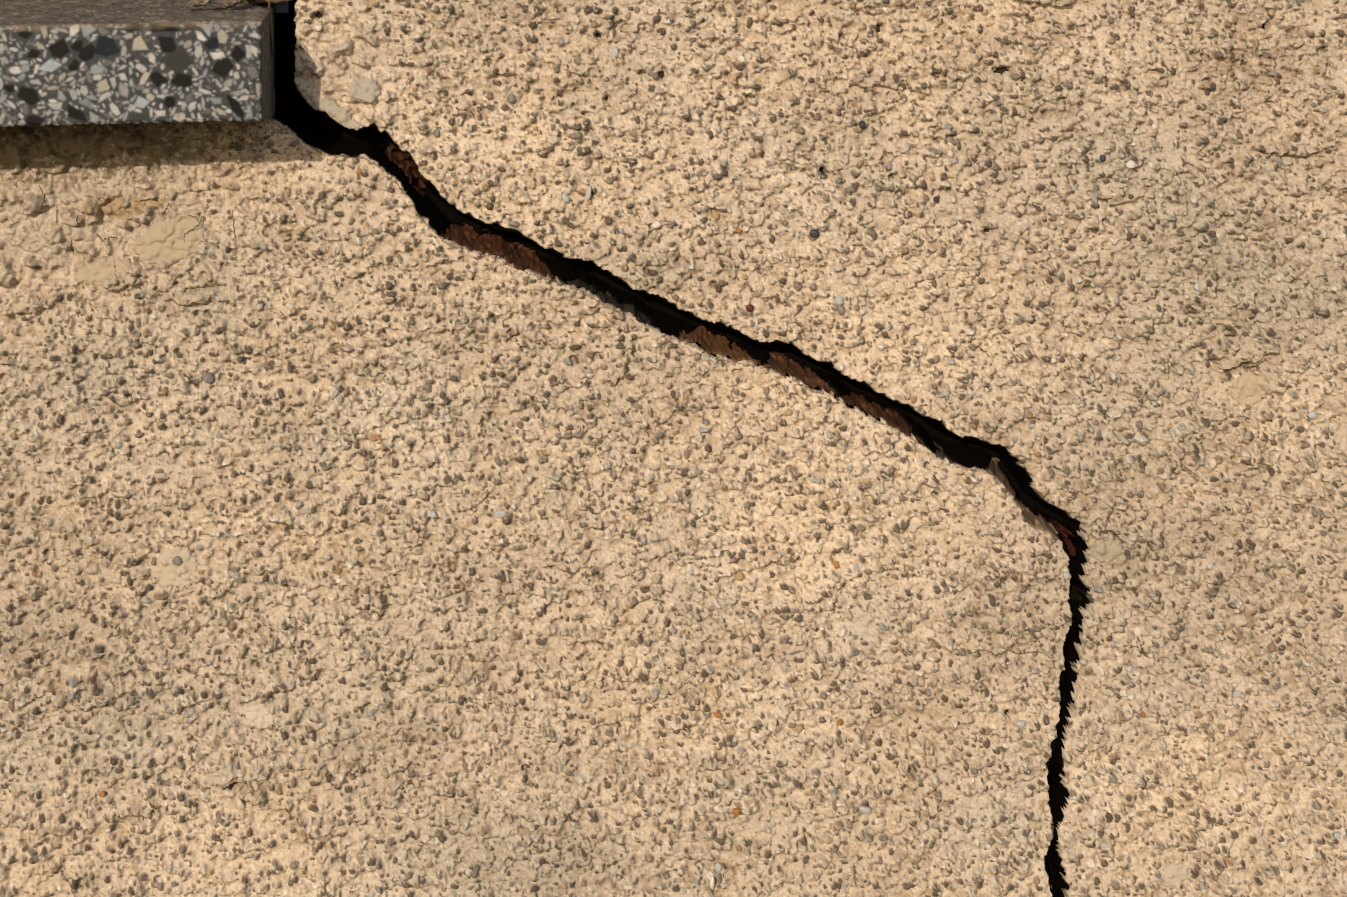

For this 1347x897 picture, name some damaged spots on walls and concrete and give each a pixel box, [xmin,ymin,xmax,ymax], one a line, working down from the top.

crack [273,0,1090,897]